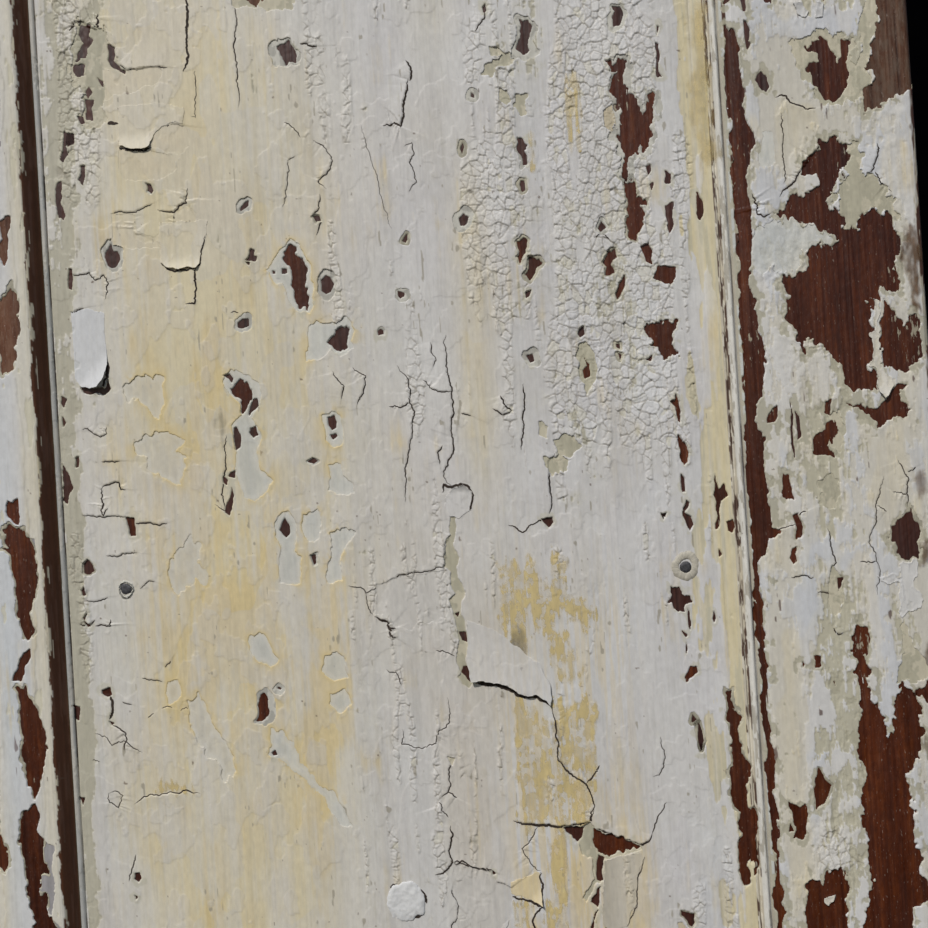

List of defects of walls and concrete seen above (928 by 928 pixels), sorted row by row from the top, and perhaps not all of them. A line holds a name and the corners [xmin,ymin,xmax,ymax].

crack [361,61,417,229]
peeling [603,54,676,285]
peeling [0,280,21,378]
peeling [266,239,354,361]
peeling [216,369,273,515]
crack [389,337,474,510]
crack [494,387,525,446]
peeling [723,0,928,928]
peeling [0,499,60,928]
crack [436,765,496,928]
crack [473,681,608,928]
crack [627,803,666,926]